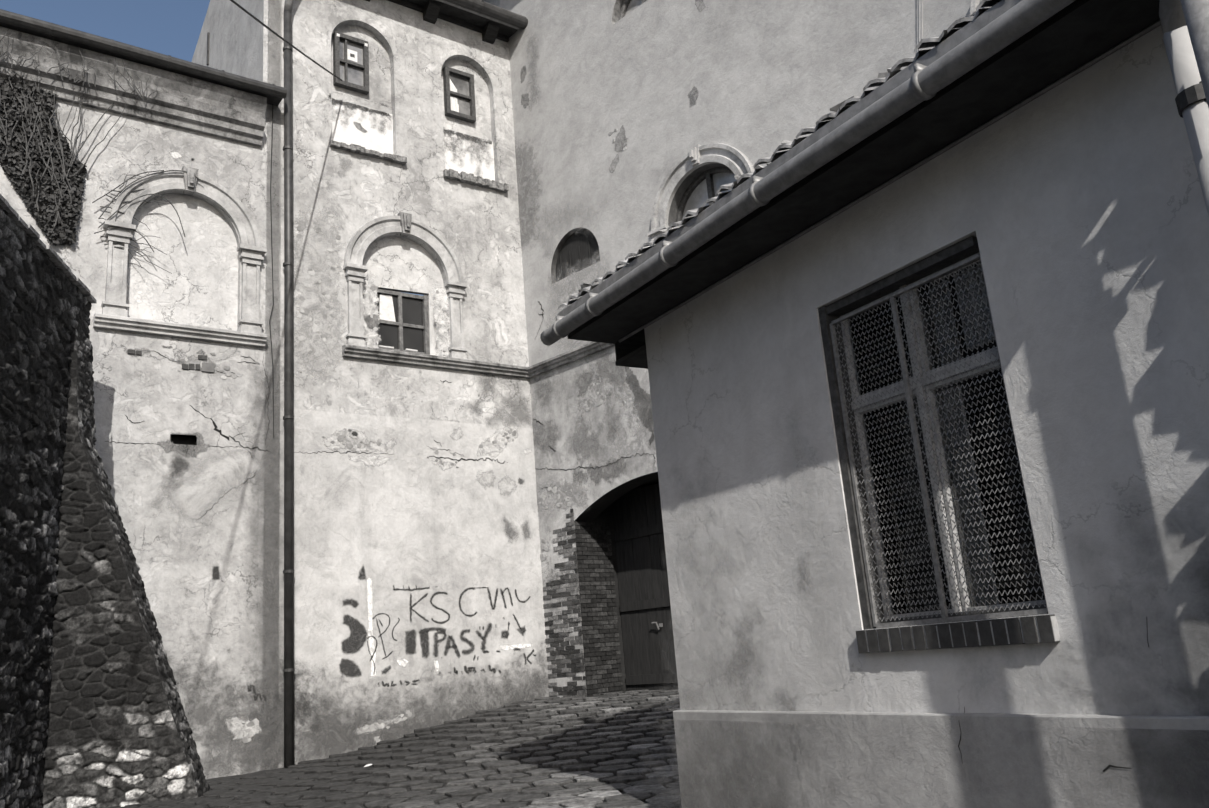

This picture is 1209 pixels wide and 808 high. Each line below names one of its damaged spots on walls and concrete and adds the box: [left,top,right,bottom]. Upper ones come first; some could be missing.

spalling [608,125,627,173]
spalling [124,346,260,379]
crack [105,415,159,445]
crack [190,356,270,520]
spalling [294,428,396,467]
flaking render [427,377,587,512]
flaking render [538,529,550,562]
spalling [226,717,261,743]